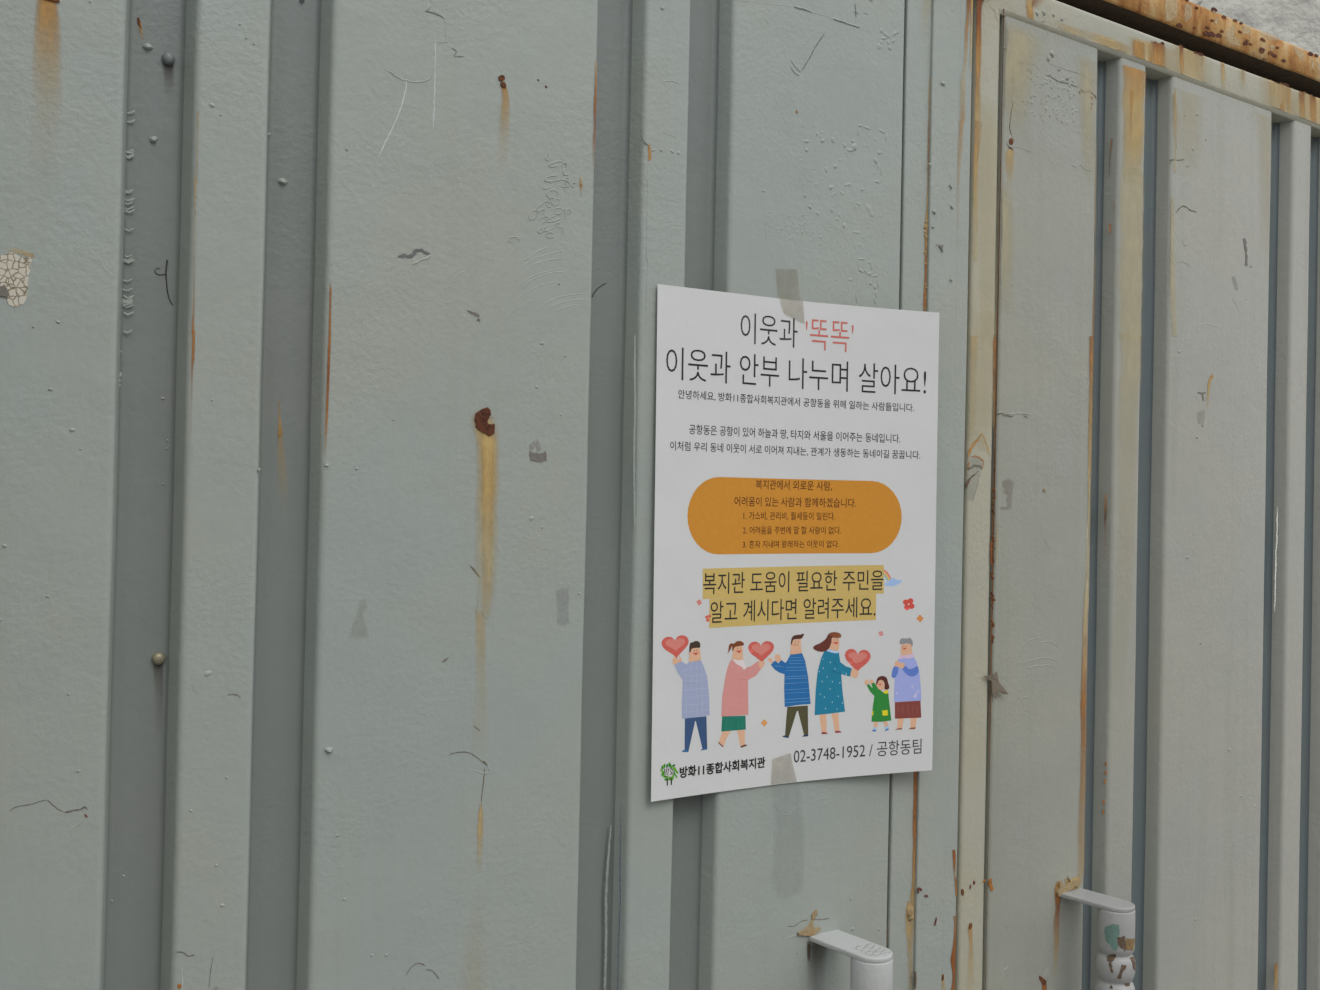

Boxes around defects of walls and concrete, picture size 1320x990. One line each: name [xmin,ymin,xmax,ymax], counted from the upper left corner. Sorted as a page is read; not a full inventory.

corrosion [39,0,60,44]
crack [382,0,464,83]
corrosion [498,75,508,107]
corrosion [961,0,984,206]
corrosion [1271,81,1320,124]
peeling [0,252,33,308]
corrosion [1095,34,1200,374]
corrosion [968,9,1027,742]
corrosion [474,407,496,573]
corrosion [1081,548,1089,802]
corrosion [910,771,928,947]
corrosion [941,916,987,990]